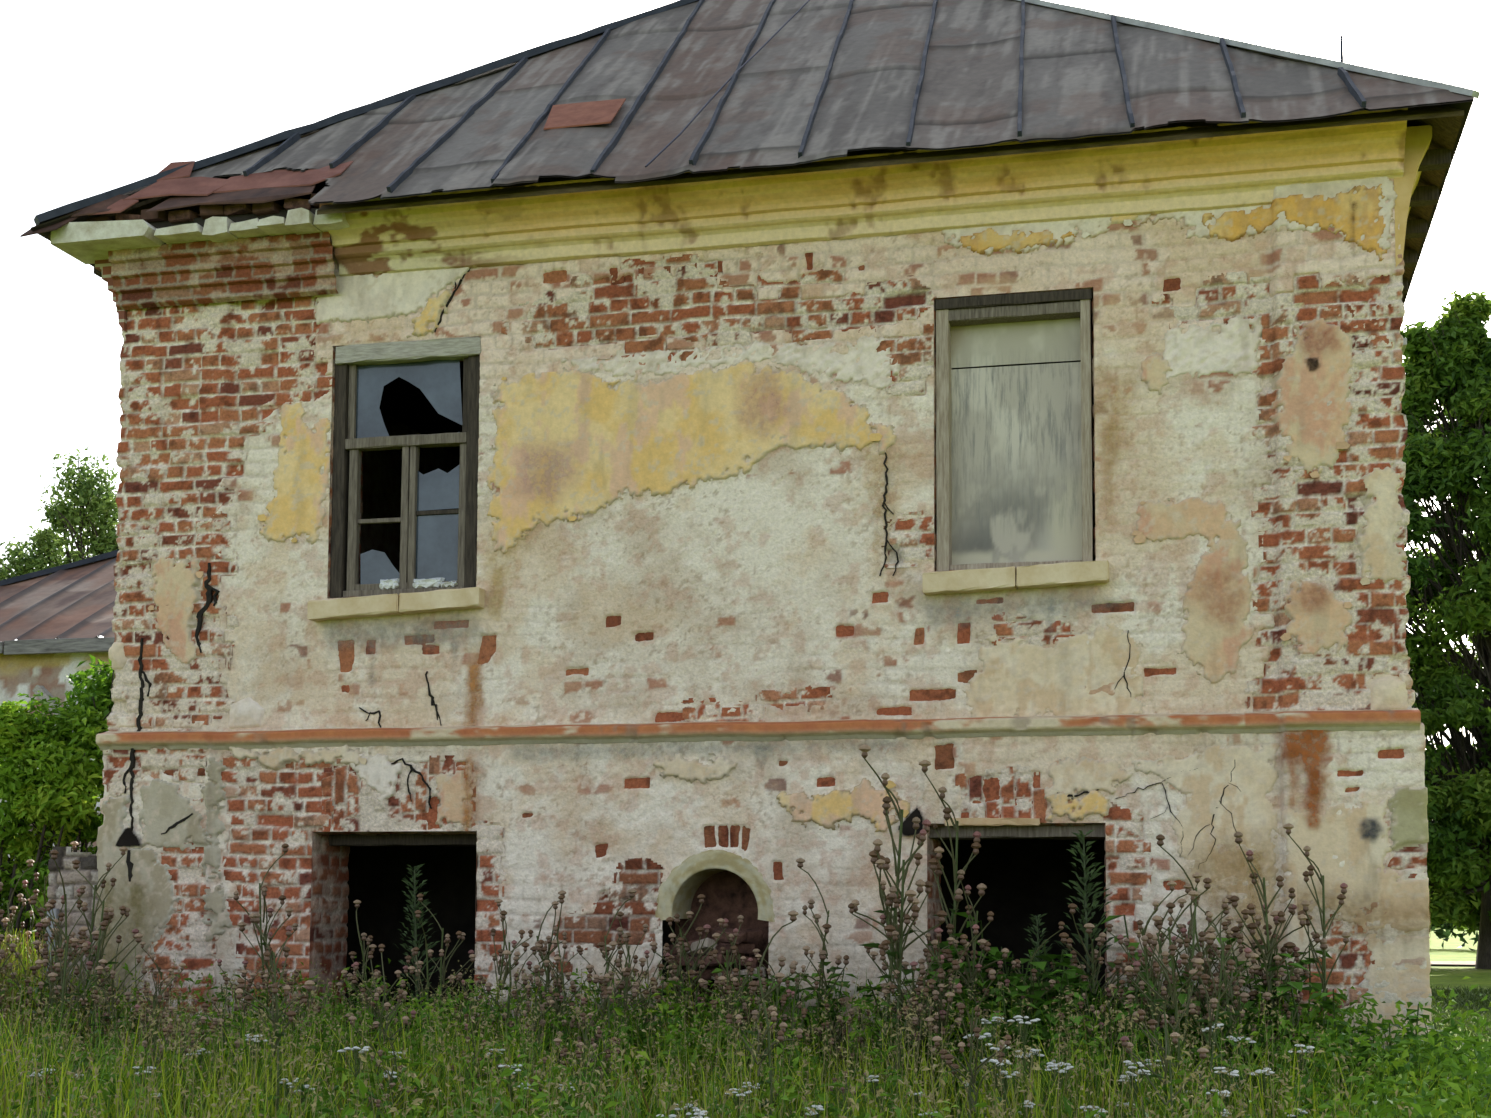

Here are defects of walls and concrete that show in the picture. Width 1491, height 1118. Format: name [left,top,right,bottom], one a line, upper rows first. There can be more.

spalling [91,267,508,1028]
peeling [486,252,937,554]
spalling [872,592,889,604]
spalling [877,176,1415,717]
peeling [934,743,1432,1051]